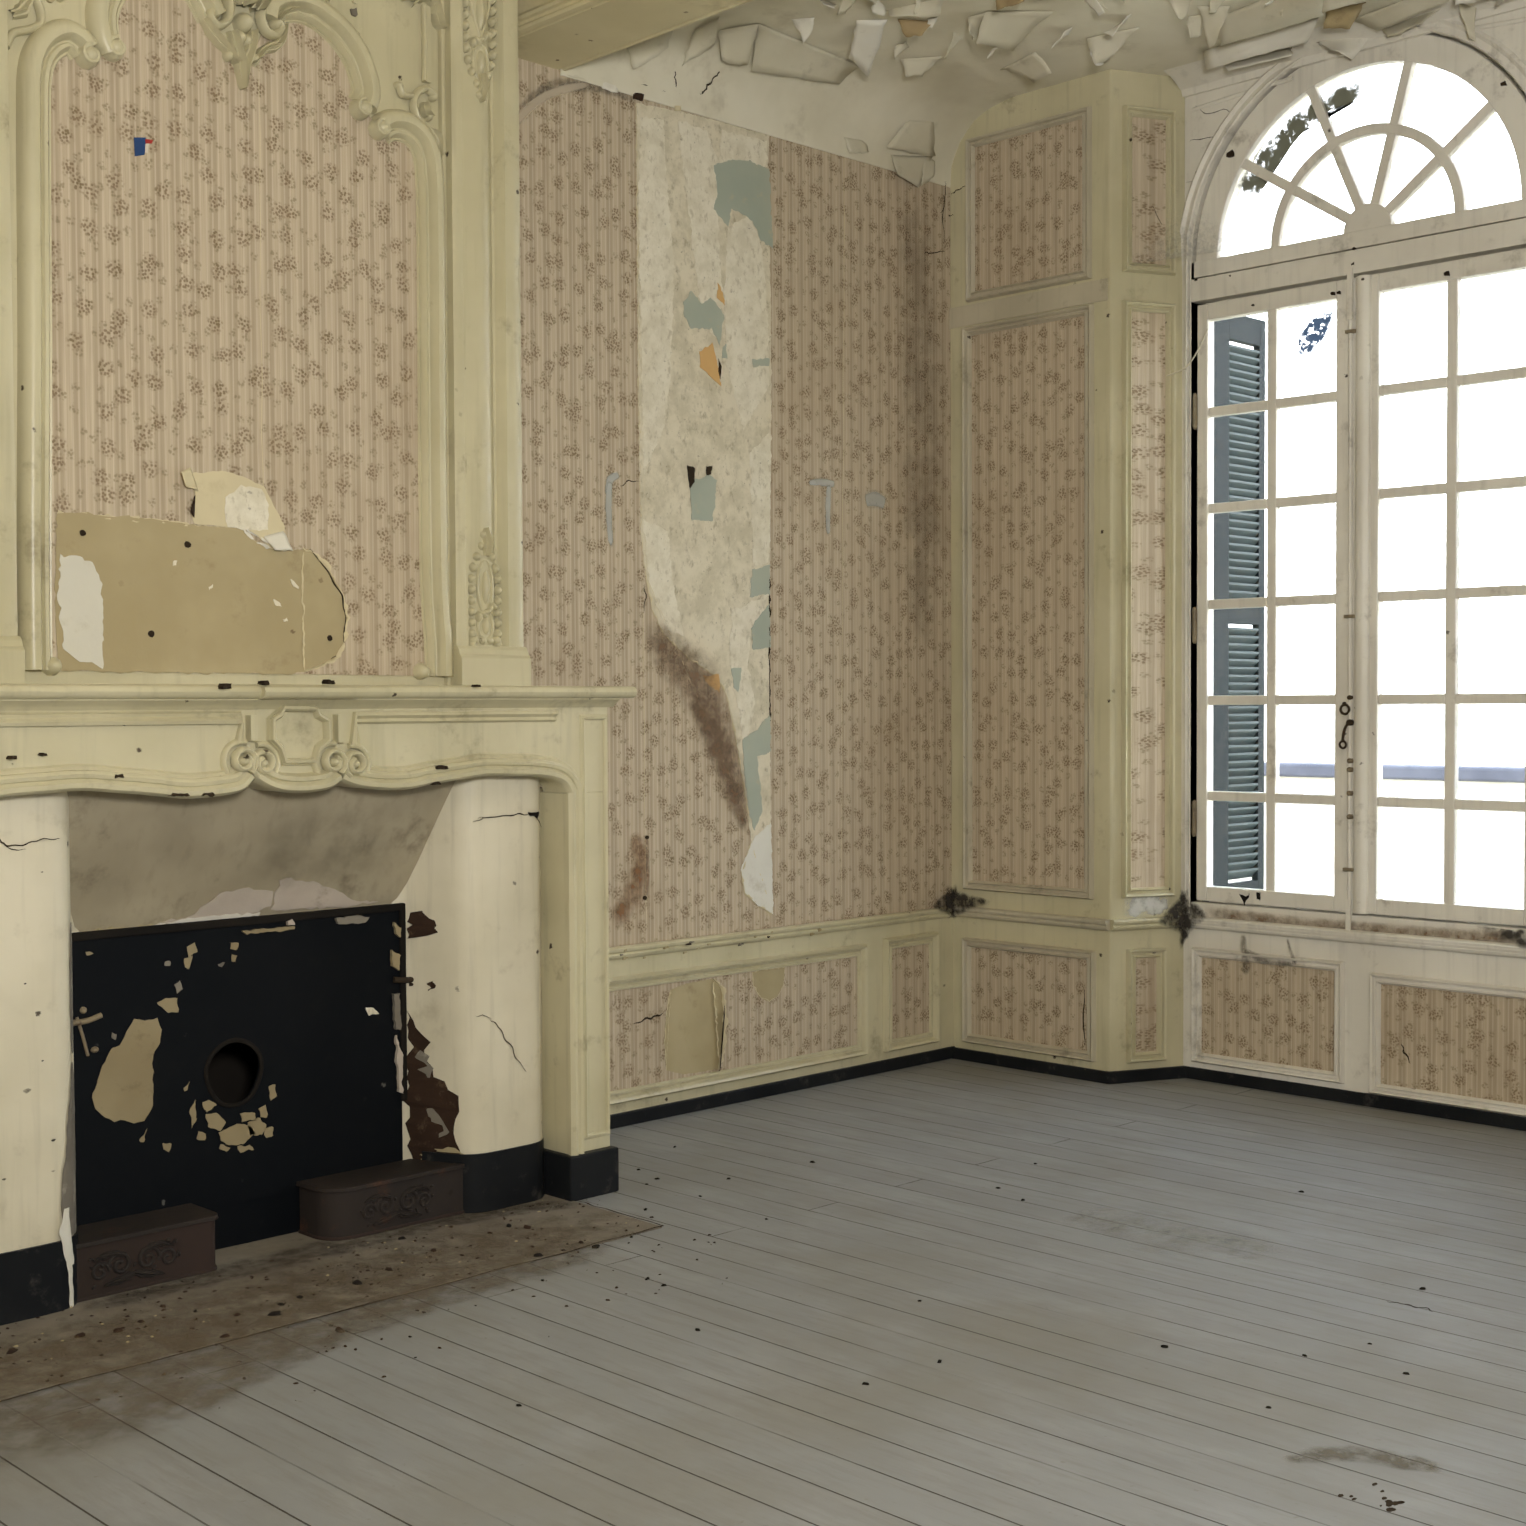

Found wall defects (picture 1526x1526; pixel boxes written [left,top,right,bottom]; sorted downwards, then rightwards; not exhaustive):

peeling [626,0,1139,84]
peeling [1167,0,1479,71]
peeling [887,121,936,187]
flaking render [567,74,772,842]
flaking render [54,512,345,689]
leakage [656,631,746,825]
crack [0,838,60,851]
crack [476,1015,526,1071]
peeling [59,878,378,1307]